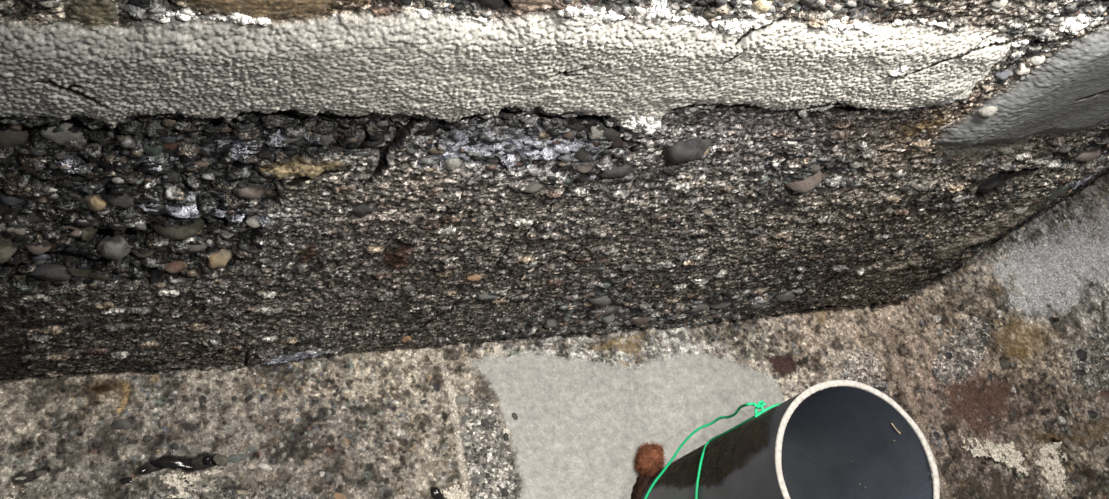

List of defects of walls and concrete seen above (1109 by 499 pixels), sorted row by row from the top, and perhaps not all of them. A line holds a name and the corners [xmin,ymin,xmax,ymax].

crack [722,18,786,66]
crack [889,32,1038,82]
crack [32,81,112,110]
flaking render [0,120,84,163]
efflorescence [429,125,605,170]
flaking render [574,125,637,183]
efflorescence [602,115,661,142]
flaking render [85,194,107,211]
flaking render [349,189,377,217]
flaking render [0,194,92,281]
flaking render [66,223,131,261]
flaking render [150,215,261,283]